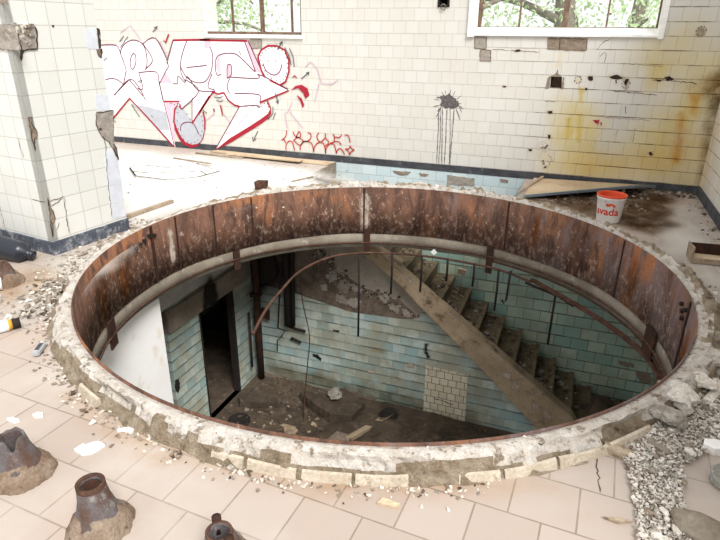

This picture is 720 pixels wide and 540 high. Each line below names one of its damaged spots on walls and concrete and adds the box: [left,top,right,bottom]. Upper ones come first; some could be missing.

spalling [0,22,38,61]
peeling [474,36,491,62]
peeling [547,37,588,51]
spalling [545,70,564,90]
peeling [28,117,38,152]
spalling [95,110,119,160]
peeling [447,175,475,186]
peeling [47,198,56,237]
spalling [159,247,537,439]